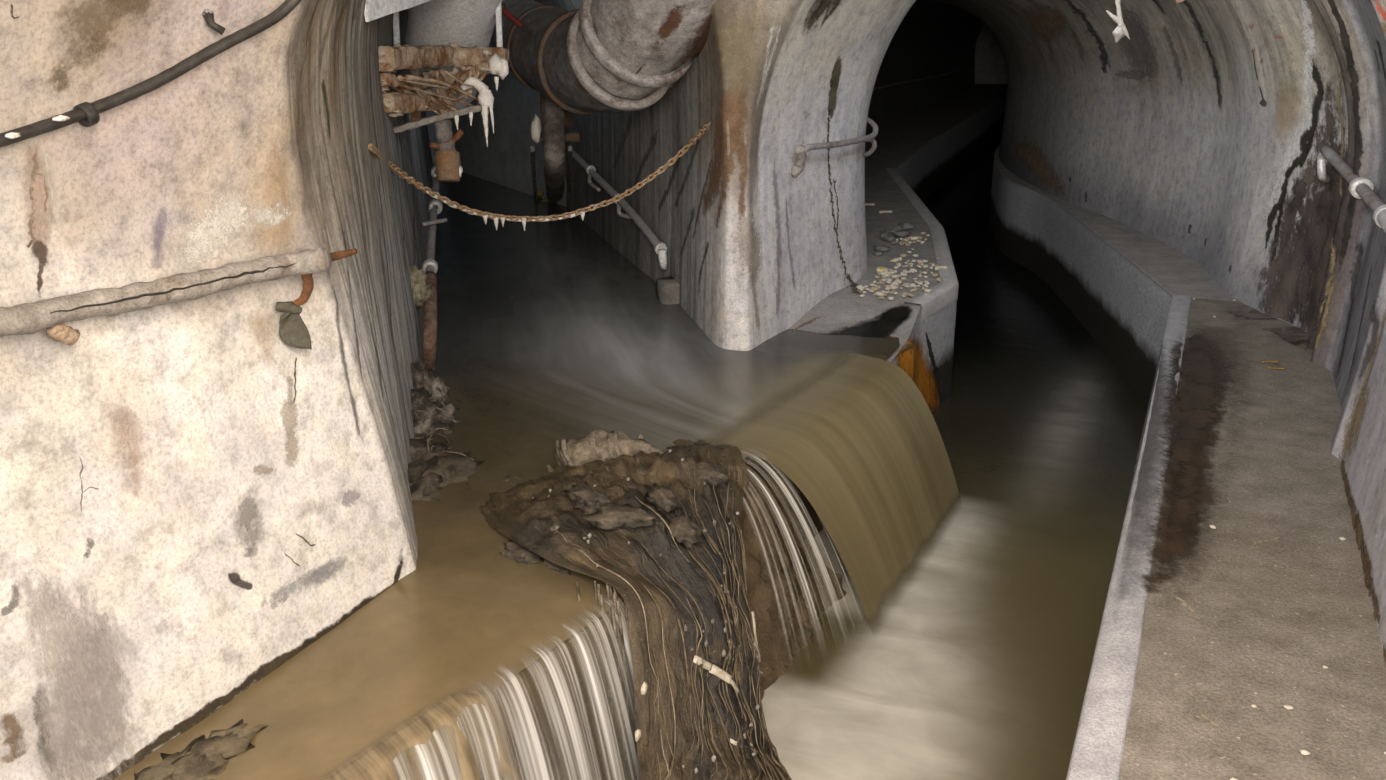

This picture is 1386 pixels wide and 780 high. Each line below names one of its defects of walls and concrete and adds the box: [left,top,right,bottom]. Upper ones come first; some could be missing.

corrosion [703,84,748,227]
water stain [804,0,840,30]
water stain [1264,0,1316,220]
water stain [1328,0,1364,175]
corrosion [897,338,939,411]
water stain [1336,195,1379,381]